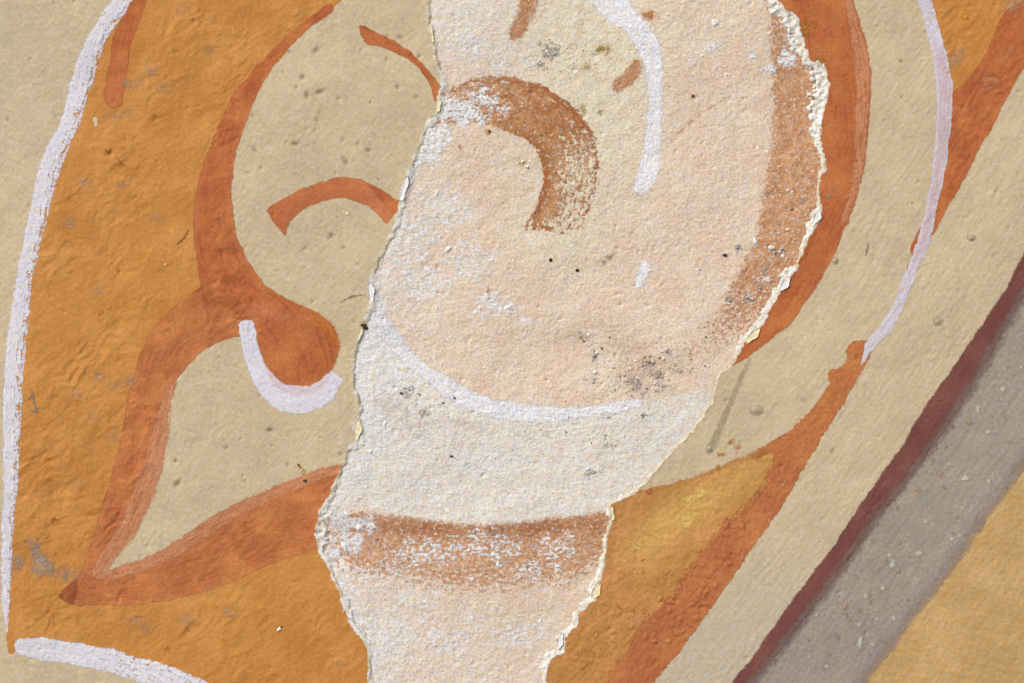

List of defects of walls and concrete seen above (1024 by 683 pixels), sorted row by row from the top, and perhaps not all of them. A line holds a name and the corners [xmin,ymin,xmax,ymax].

peeling [314,0,831,683]